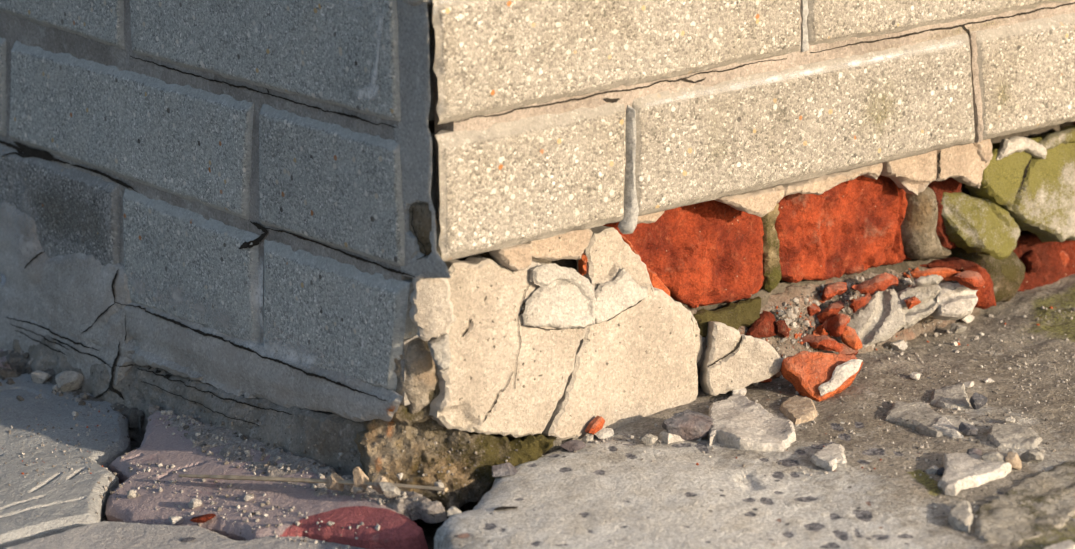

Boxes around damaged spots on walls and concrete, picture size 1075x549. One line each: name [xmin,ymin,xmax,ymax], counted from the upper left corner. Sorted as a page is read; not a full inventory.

spalling [409,203,437,256]
peeling [637,211,664,224]
peeling [715,136,1047,217]
crack [1014,157,1032,201]
spalling [489,228,648,329]
peeling [911,274,943,286]
crack [7,269,386,426]
spalling [394,273,457,414]
crack [483,287,642,422]